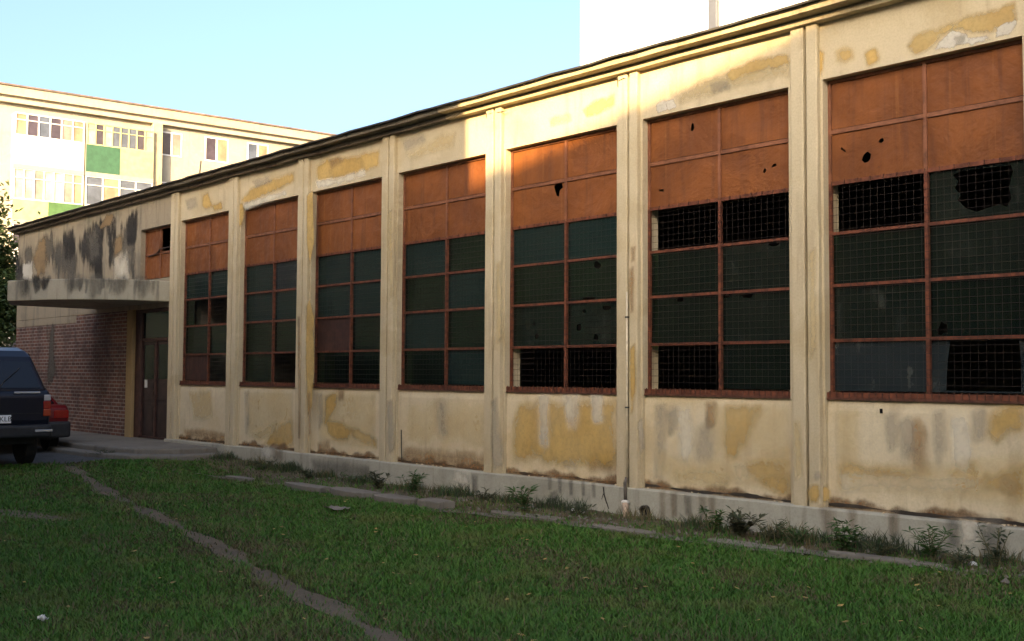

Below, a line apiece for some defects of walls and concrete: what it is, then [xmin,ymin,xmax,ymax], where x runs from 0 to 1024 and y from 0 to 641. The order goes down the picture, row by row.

peeling [909,4,1016,54]
peeling [656,55,788,113]
mould [14,212,147,294]
water stain [699,404,759,456]